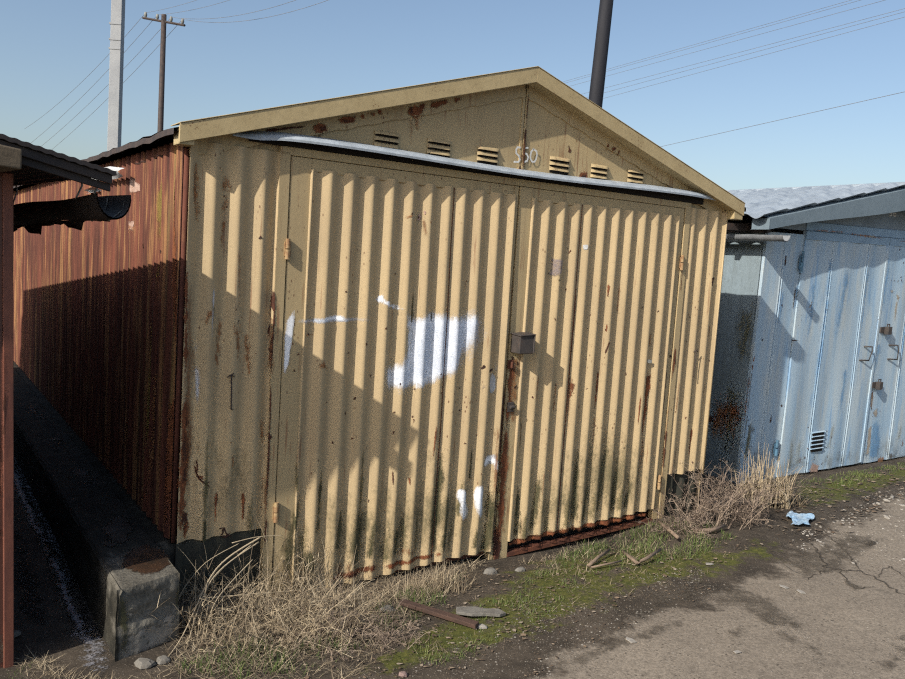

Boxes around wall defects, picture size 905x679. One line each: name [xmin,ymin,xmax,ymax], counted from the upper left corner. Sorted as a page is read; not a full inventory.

corrosion [408,97,460,127]
corrosion [177,272,194,539]
corrosion [562,299,576,453]
corrosion [638,376,651,435]
corrosion [659,348,678,466]
corrosion [260,387,272,542]
corrosion [334,550,441,582]
water stain [334,453,472,560]
water stain [473,499,495,549]
water stain [522,481,547,537]
corrosion [487,367,646,560]
water stain [554,450,637,527]